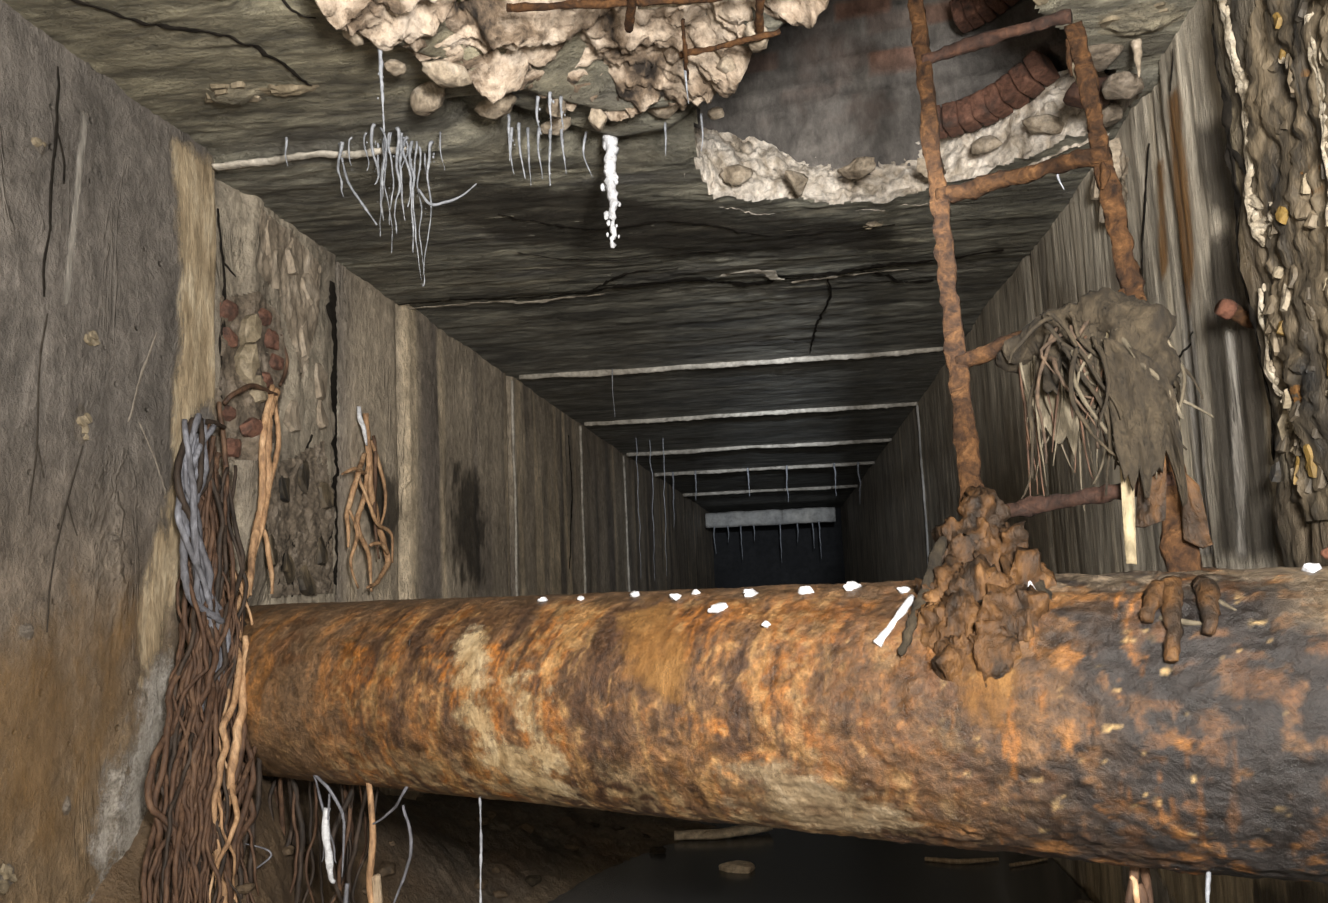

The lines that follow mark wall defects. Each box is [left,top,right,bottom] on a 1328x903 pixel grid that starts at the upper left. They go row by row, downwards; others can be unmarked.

crack [71,0,316,86]
spalling [314,0,930,230]
water stain [437,184,898,257]
spalling [940,69,1089,182]
spalling [1089,172,1105,223]
spalling [1107,133,1129,203]
crack [397,213,1004,353]
rust [622,603,684,696]
rust [968,652,1011,708]